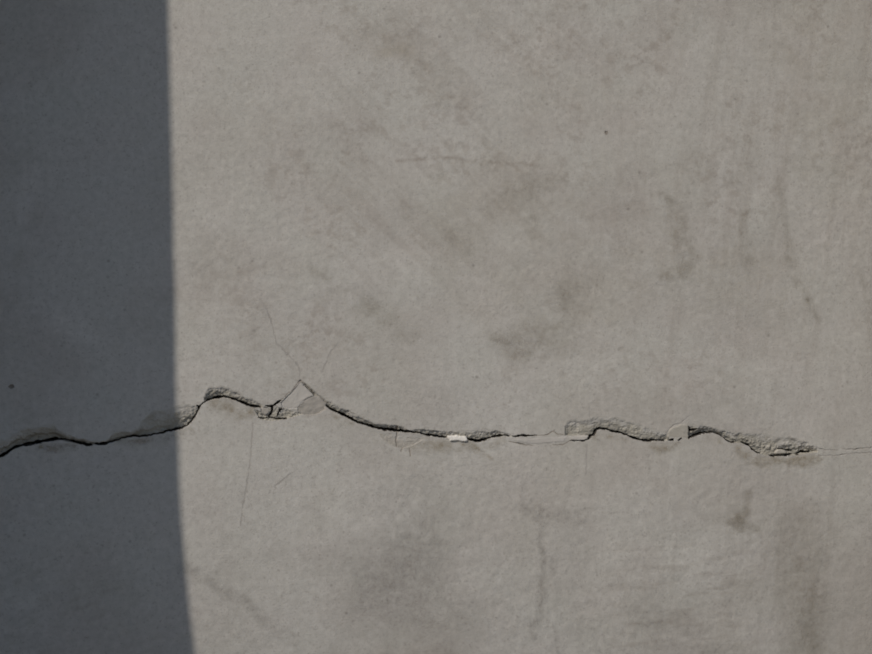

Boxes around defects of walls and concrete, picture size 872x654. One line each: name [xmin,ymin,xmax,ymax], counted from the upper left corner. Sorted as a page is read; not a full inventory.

crack [0,299,872,527]